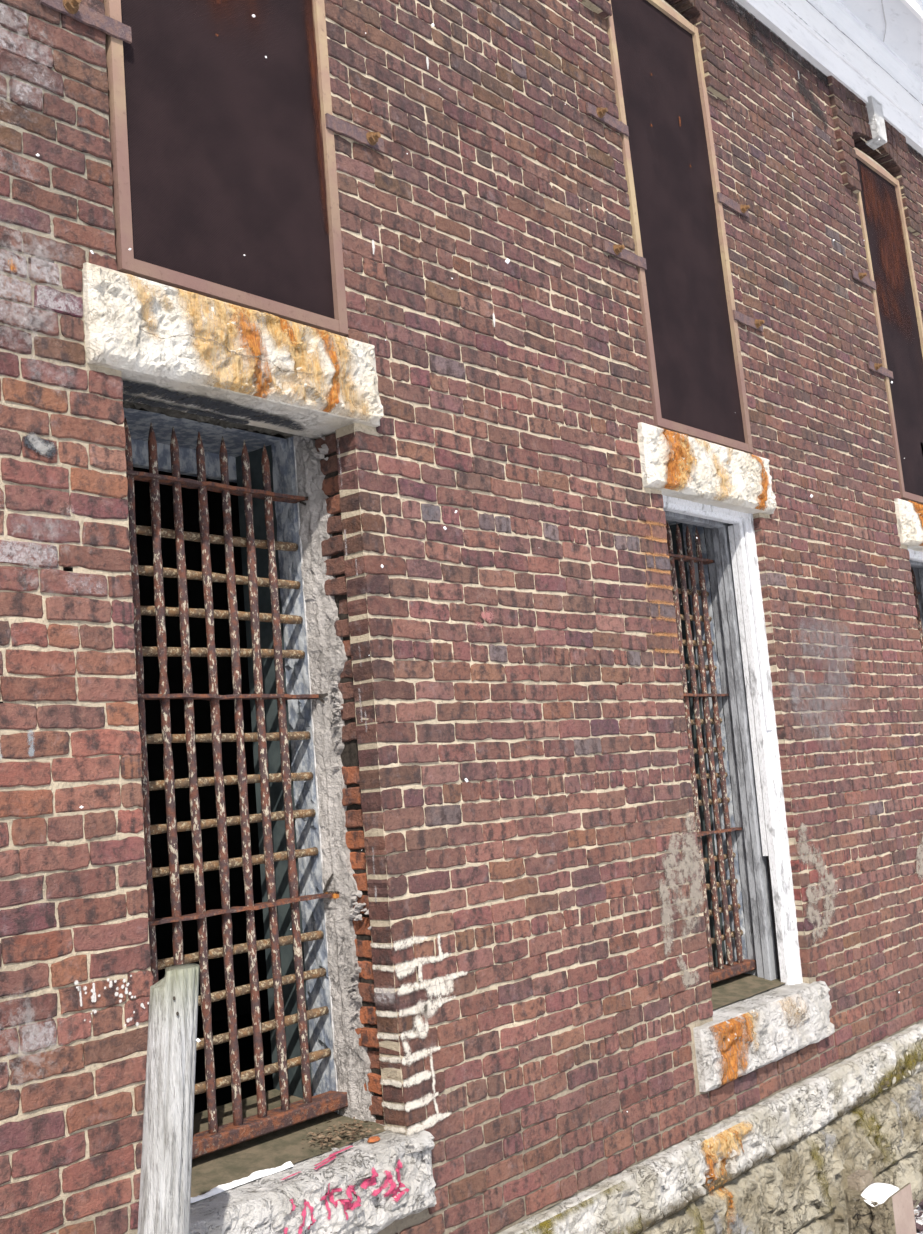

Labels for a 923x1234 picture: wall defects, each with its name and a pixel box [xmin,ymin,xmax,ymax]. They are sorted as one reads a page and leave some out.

rust [130,275,167,327]
rust [176,288,352,412]
rust [663,428,731,501]
rust [751,454,769,511]
rust [908,500,923,528]
rust [713,1013,755,1086]
water stain [829,1059,914,1158]
water stain [521,1188,610,1234]
water stain [623,1134,829,1234]
rust [702,1122,752,1224]
crack [852,1212,873,1234]